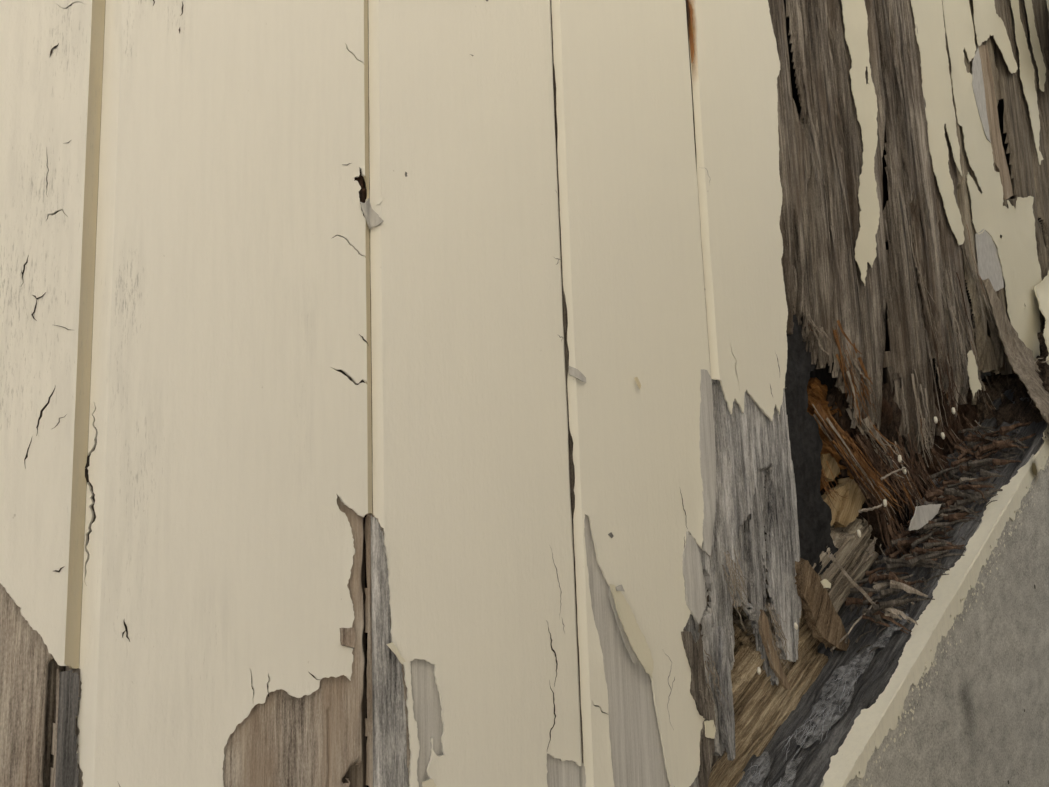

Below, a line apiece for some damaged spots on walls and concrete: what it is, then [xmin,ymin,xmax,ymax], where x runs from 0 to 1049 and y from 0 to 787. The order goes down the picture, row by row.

corrosion [686,0,695,67]
peeling [0,583,83,787]
crack [21,258,70,330]
crack [24,388,67,464]
crack [84,427,97,562]
peeling [222,496,443,787]
crack [334,369,365,385]
crack [547,549,565,749]
peeling [547,754,586,787]
peeling [584,515,670,787]
peeling [681,357,802,787]
peeling [768,0,1049,459]